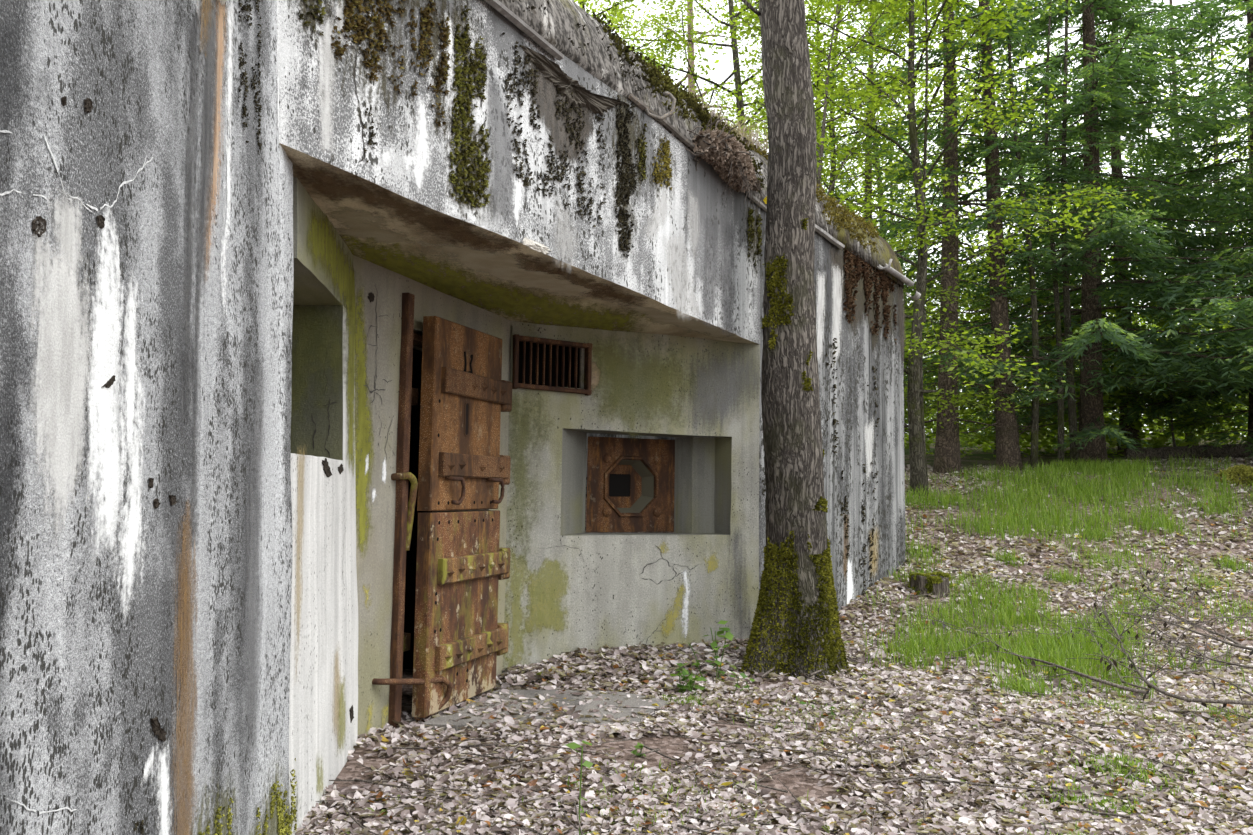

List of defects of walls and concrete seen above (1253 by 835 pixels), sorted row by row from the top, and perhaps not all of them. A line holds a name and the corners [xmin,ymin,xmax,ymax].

crack [0,134,153,214]
rust [200,0,227,264]
leakage [319,6,346,149]
leakage [381,97,433,189]
leakage [444,12,457,127]
leakage [487,82,524,227]
leakage [523,44,593,166]
leakage [816,246,906,371]
leakage [0,199,145,619]
leakage [865,421,874,479]
crack [641,545,699,584]
rust [171,503,198,835]